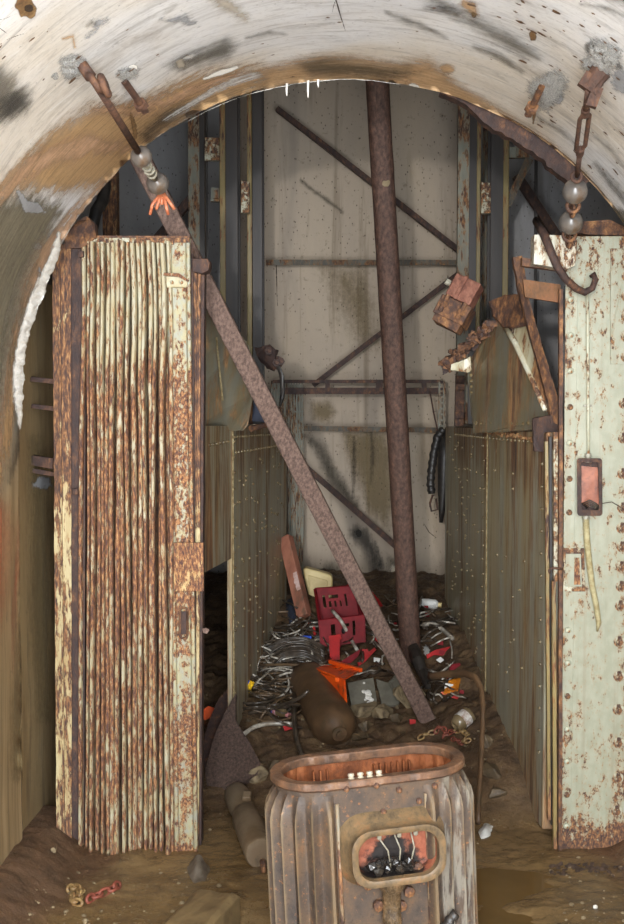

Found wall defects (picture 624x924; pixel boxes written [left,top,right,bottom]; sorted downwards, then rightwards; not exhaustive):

corrosion [514,0,547,45]
spalling [52,36,86,80]
spalling [527,71,569,113]
spalling [581,38,624,93]
damp [0,41,624,482]
damp [347,434,391,518]